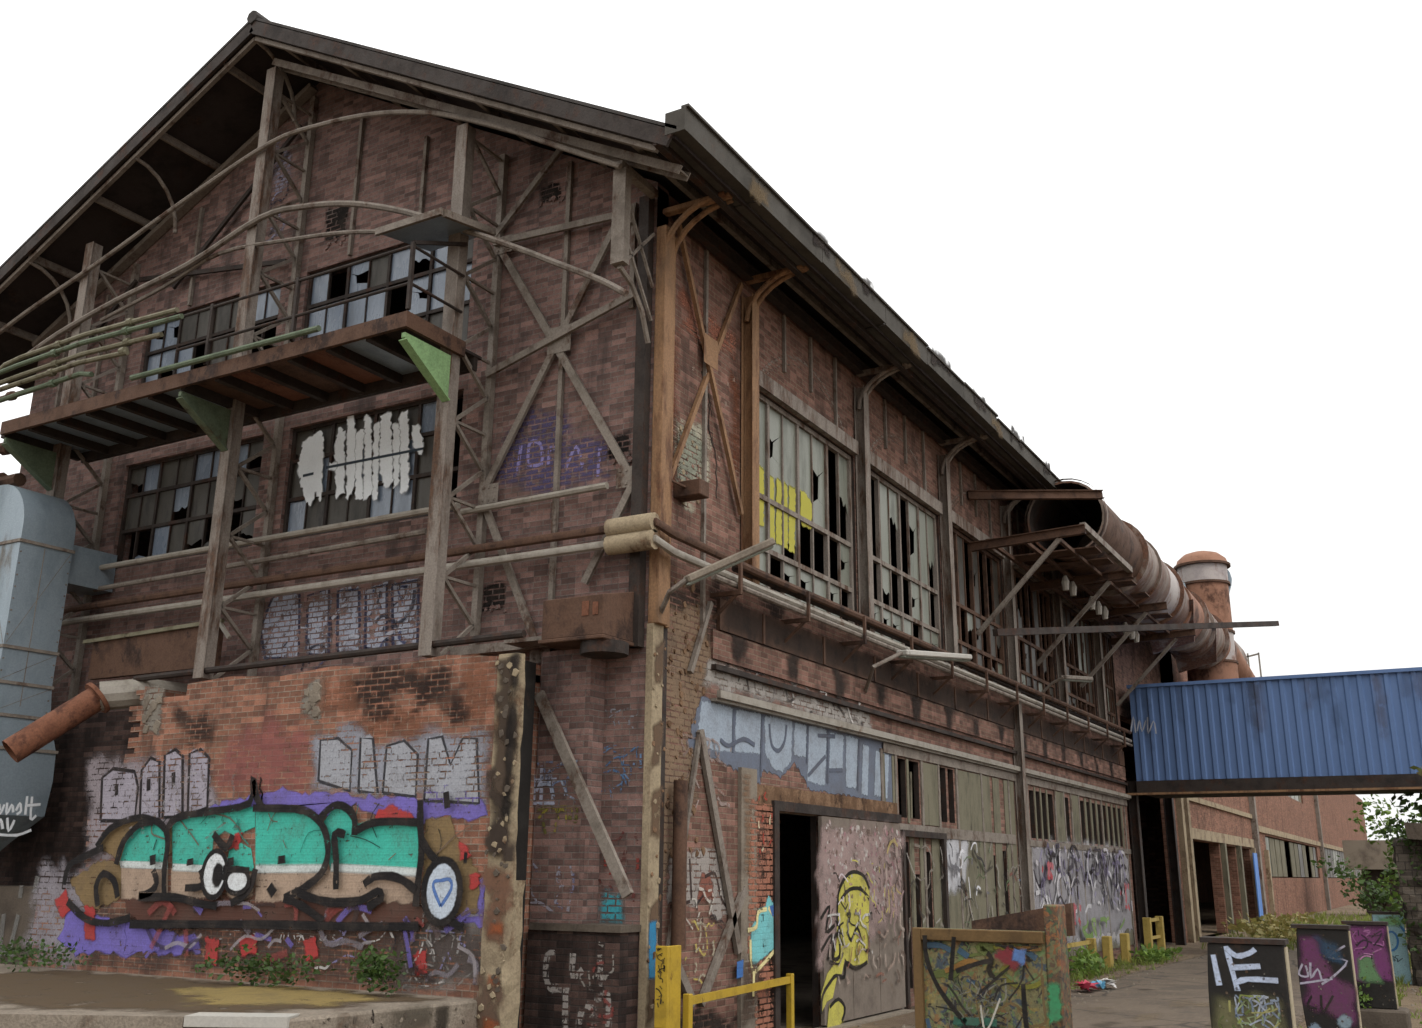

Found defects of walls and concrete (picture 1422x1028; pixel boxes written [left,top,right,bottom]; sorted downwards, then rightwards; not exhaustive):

peeling [400,657,520,1028]